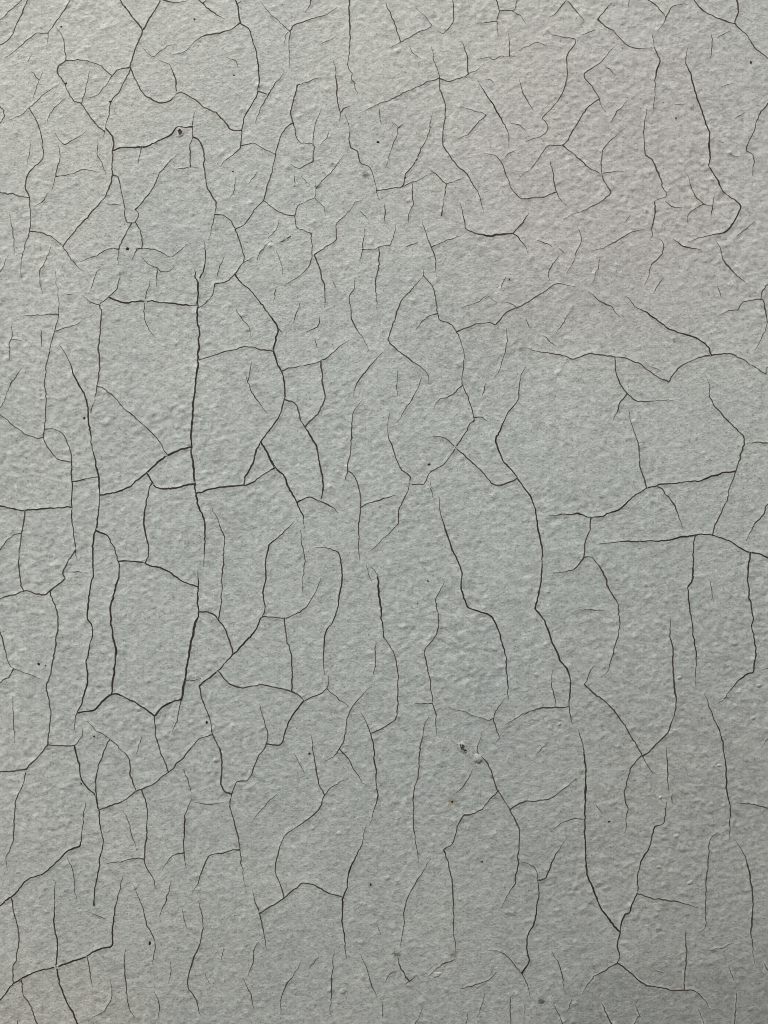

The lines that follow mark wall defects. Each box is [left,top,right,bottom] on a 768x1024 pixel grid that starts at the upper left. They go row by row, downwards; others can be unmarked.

crack [0,0,405,1024]
crack [342,201,719,1024]
crack [332,0,768,317]
crack [527,294,768,973]
crack [716,279,768,350]
crack [707,941,740,1024]